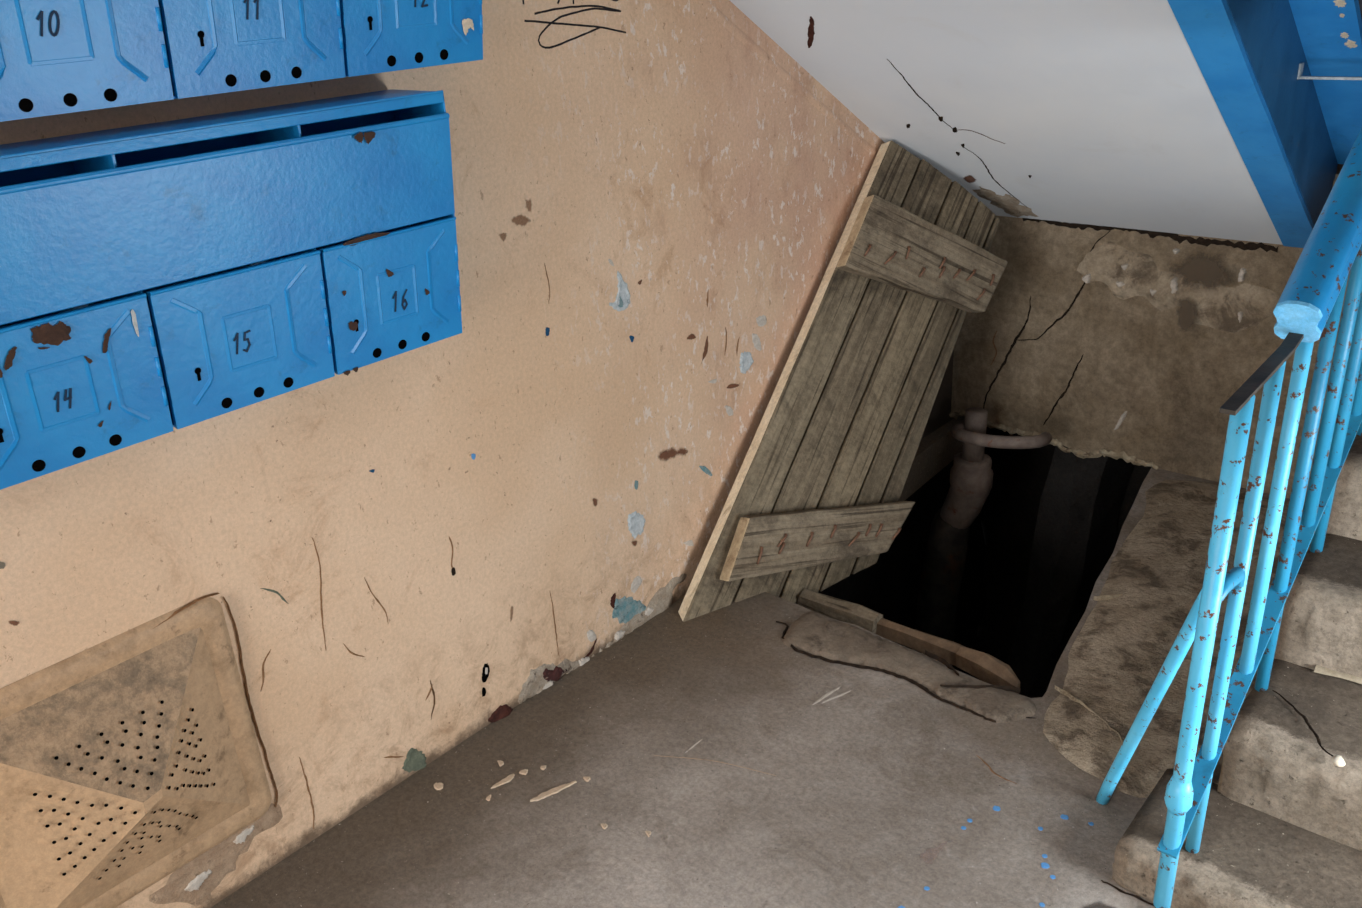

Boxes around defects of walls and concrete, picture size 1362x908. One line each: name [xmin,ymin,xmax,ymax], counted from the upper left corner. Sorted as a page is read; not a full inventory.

crack [887,59,1278,409]
spalling [1077,241,1279,333]
crack [1043,355,1083,425]
peeling [627,511,646,539]
spalling [482,663,490,697]
spalling [488,573,687,723]
crack [776,621,1035,723]